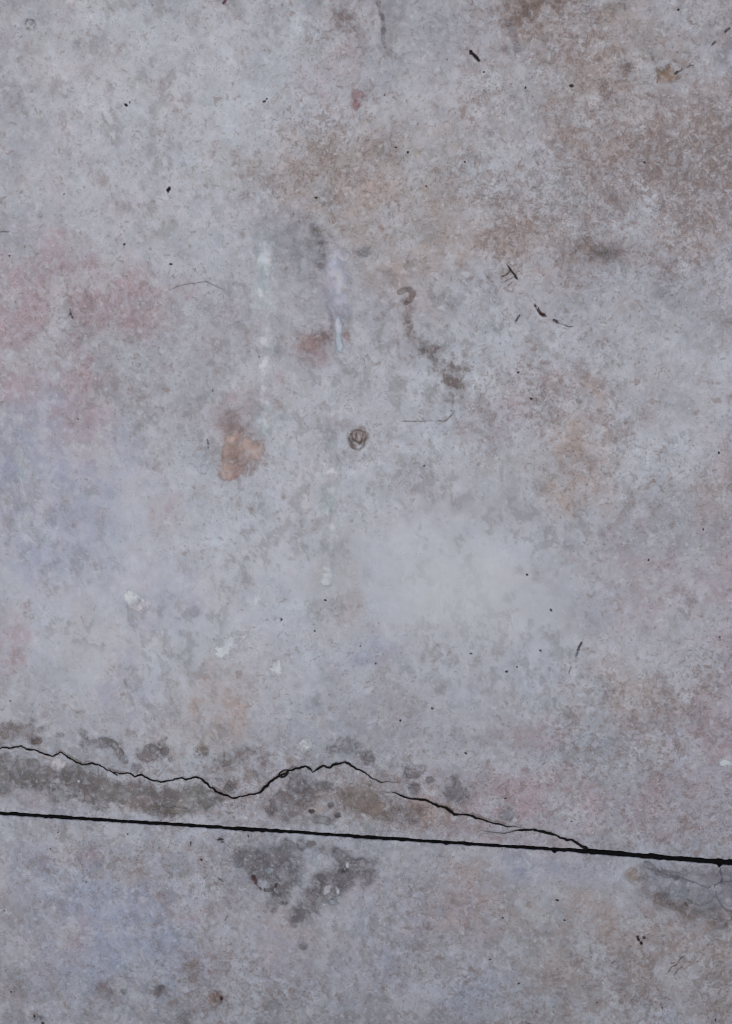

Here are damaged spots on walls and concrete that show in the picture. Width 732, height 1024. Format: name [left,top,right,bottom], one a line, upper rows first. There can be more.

crack [0,745,588,851]